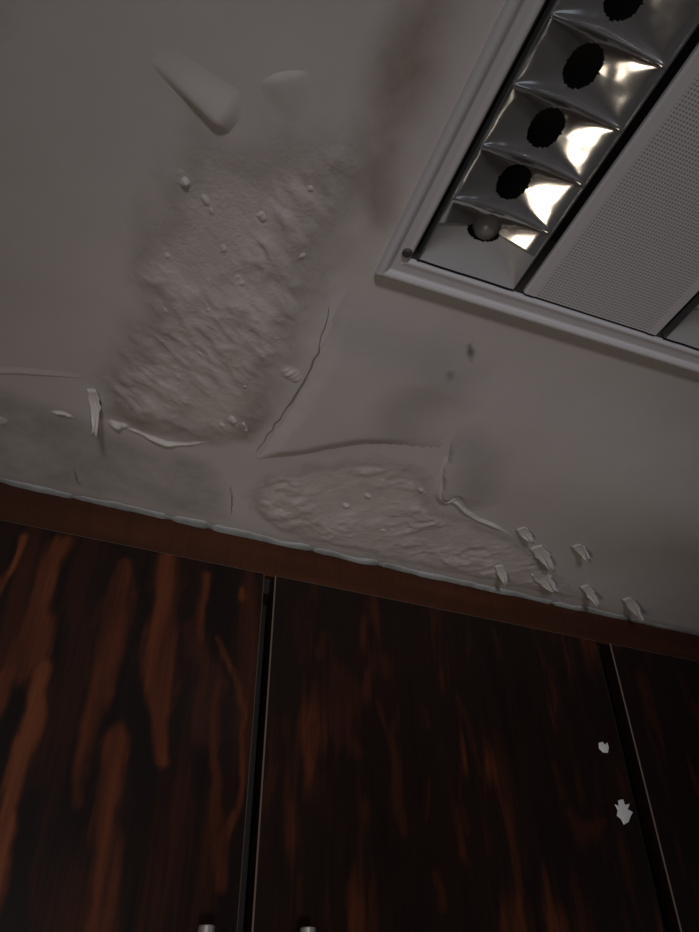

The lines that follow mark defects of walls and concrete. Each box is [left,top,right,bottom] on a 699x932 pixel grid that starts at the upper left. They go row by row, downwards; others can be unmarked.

flaking render [110,142,358,447]
crack [257,307,329,450]
peeling [255,446,601,608]
peeling [622,597,645,624]